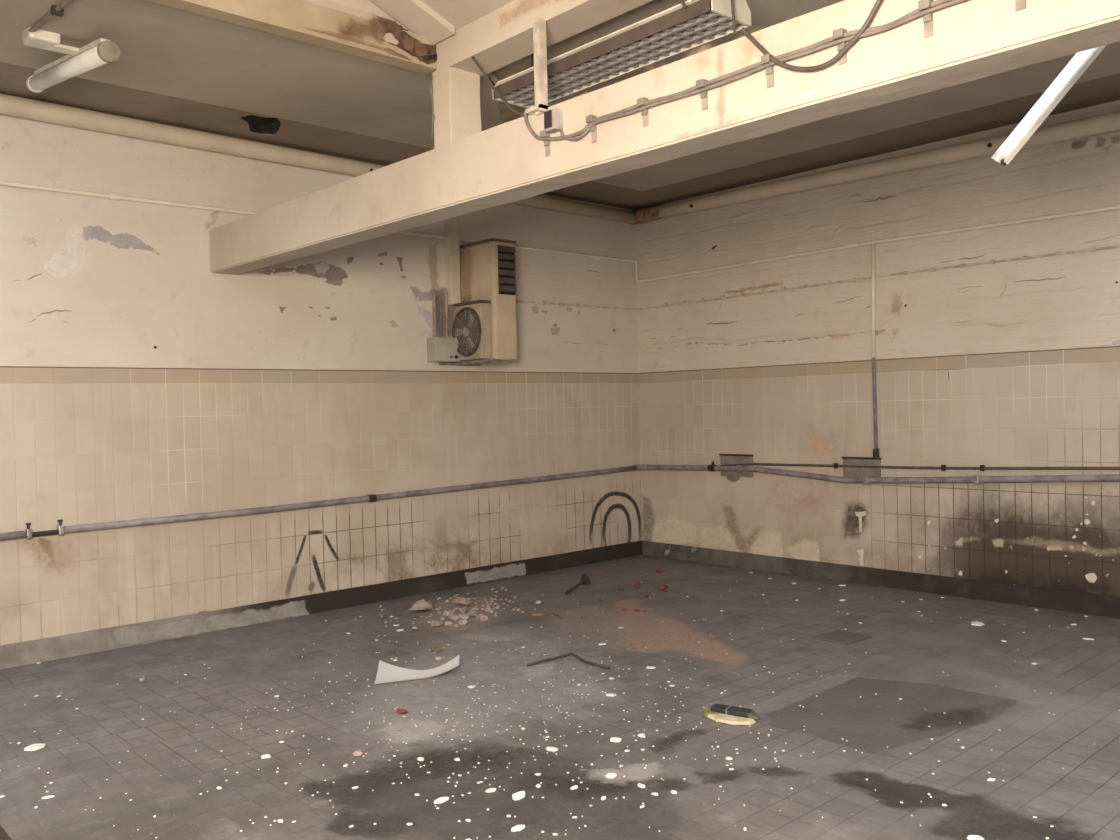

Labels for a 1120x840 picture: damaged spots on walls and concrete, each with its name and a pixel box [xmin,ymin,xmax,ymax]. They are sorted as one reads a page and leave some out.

spalling [309,16,437,65]
peeling [82,225,160,255]
peeling [259,257,354,320]
peeling [378,252,433,329]